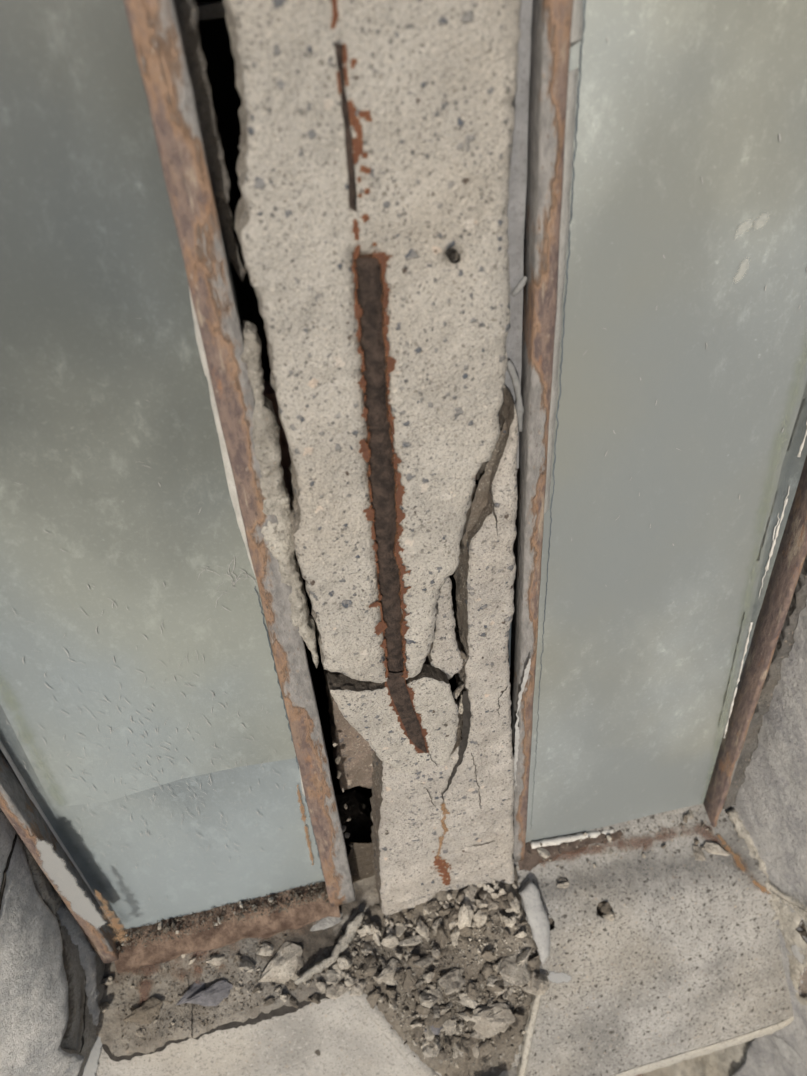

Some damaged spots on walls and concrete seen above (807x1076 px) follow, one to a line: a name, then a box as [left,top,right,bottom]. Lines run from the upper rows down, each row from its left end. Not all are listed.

corrosion [331,0,339,29]
corrosion [336,43,373,198]
corrosion [351,214,429,754]
crack [490,491,498,536]
crack [424,686,508,807]
crack [0,834,17,910]
corrosion [297,785,314,865]
corrosion [433,803,451,885]
corrosion [554,827,746,871]
peeling [175,980,233,1006]
spalling [323,866,554,1076]